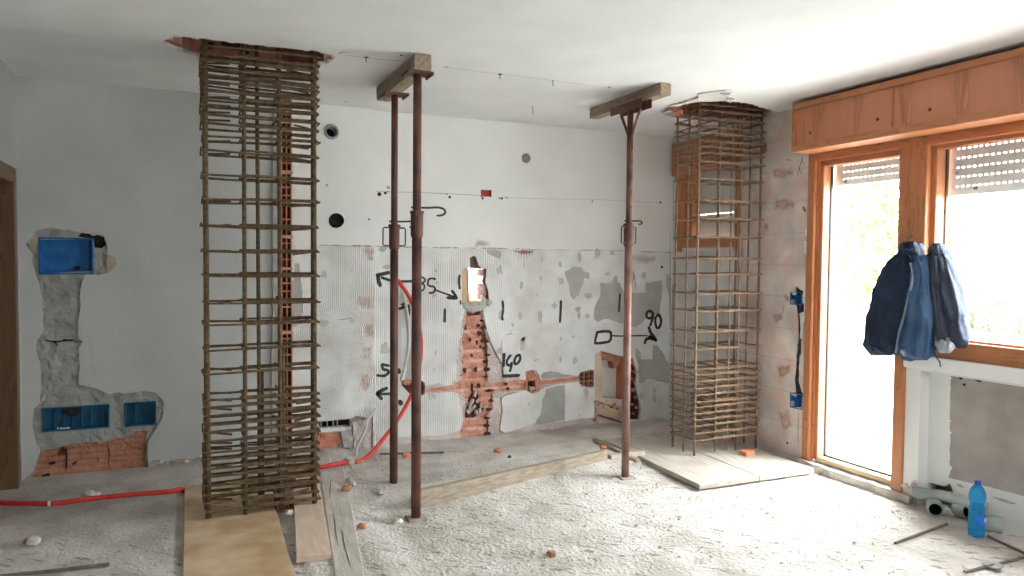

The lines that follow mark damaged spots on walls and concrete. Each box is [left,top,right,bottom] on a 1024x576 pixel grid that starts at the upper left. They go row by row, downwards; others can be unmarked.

spalling [160,35,335,71]
flaking render [662,90,773,120]
flaking render [26,226,202,478]
flaking render [282,115,674,449]